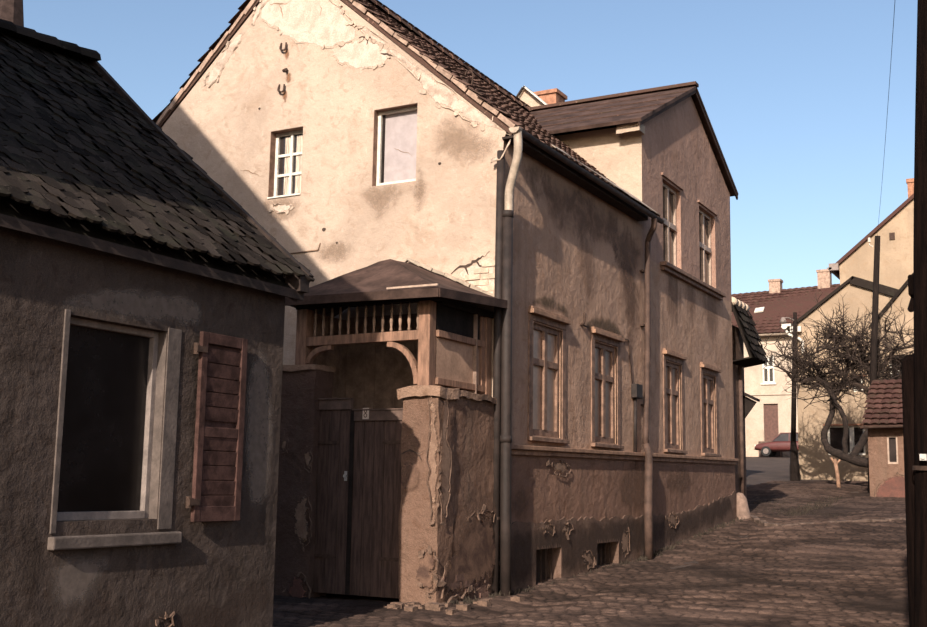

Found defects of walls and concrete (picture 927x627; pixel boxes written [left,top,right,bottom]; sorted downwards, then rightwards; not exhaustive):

flaking render [202,33,243,88]
flaking render [251,0,512,136]
flaking render [269,203,294,215]
crack [451,255,486,275]
water stain [531,178,639,327]
water stain [587,320,630,342]
spalling [426,395,452,525]
flaking render [294,493,312,552]
water stain [511,498,731,582]
flaking render [155,611,175,627]